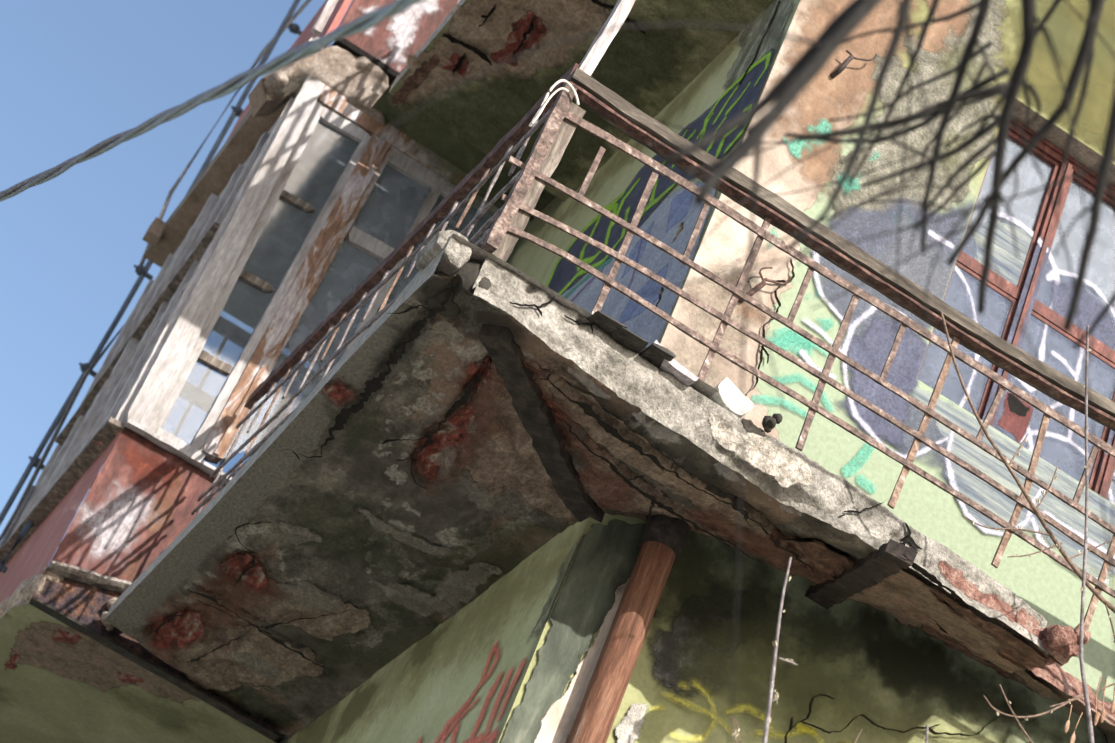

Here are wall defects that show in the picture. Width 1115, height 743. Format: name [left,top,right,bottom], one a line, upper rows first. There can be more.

peeling [381,0,608,108]
peeling [724,0,1009,220]
peeling [0,552,371,703]
crack [145,522,347,671]
peeling [415,357,577,526]
crack [528,373,821,581]
peeling [501,360,853,743]
peeling [660,193,815,488]
water stain [654,532,1062,743]
crack [784,694,1004,743]